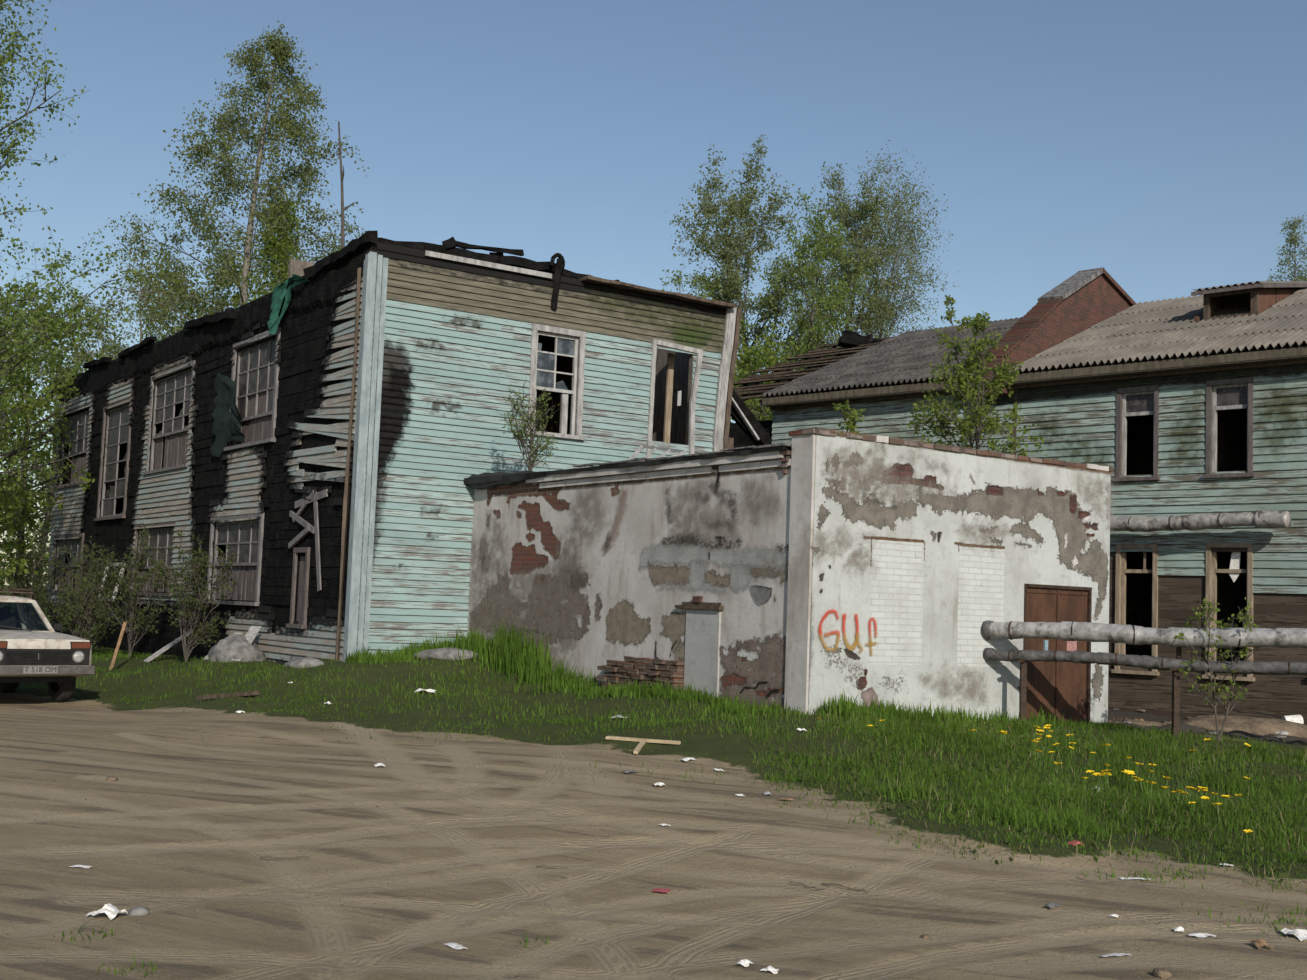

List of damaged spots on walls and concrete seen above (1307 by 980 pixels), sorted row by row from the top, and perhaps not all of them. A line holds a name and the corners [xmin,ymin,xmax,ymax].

leakage [471,494,602,671]
peeling [469,480,686,661]
peeling [647,561,788,605]
peeling [817,451,1109,621]
peeling [719,629,786,711]
peeling [1091,664,1104,701]